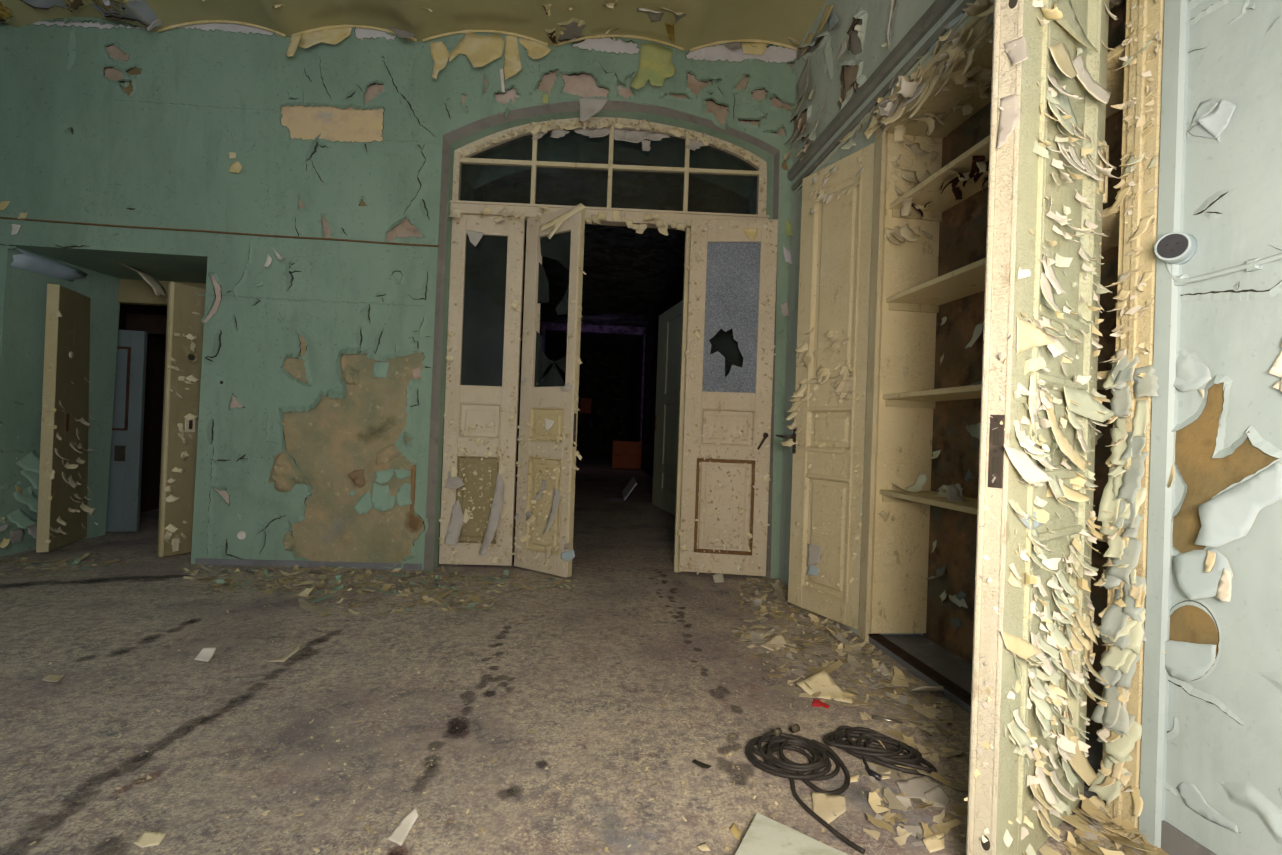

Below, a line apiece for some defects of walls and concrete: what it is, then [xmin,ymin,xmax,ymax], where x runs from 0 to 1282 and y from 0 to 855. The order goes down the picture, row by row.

crack [288,56,454,221]
crack [204,260,302,365]
crack [356,268,432,407]
crack [1180,244,1282,302]
peeling [0,0,968,855]
peeling [1163,354,1282,683]